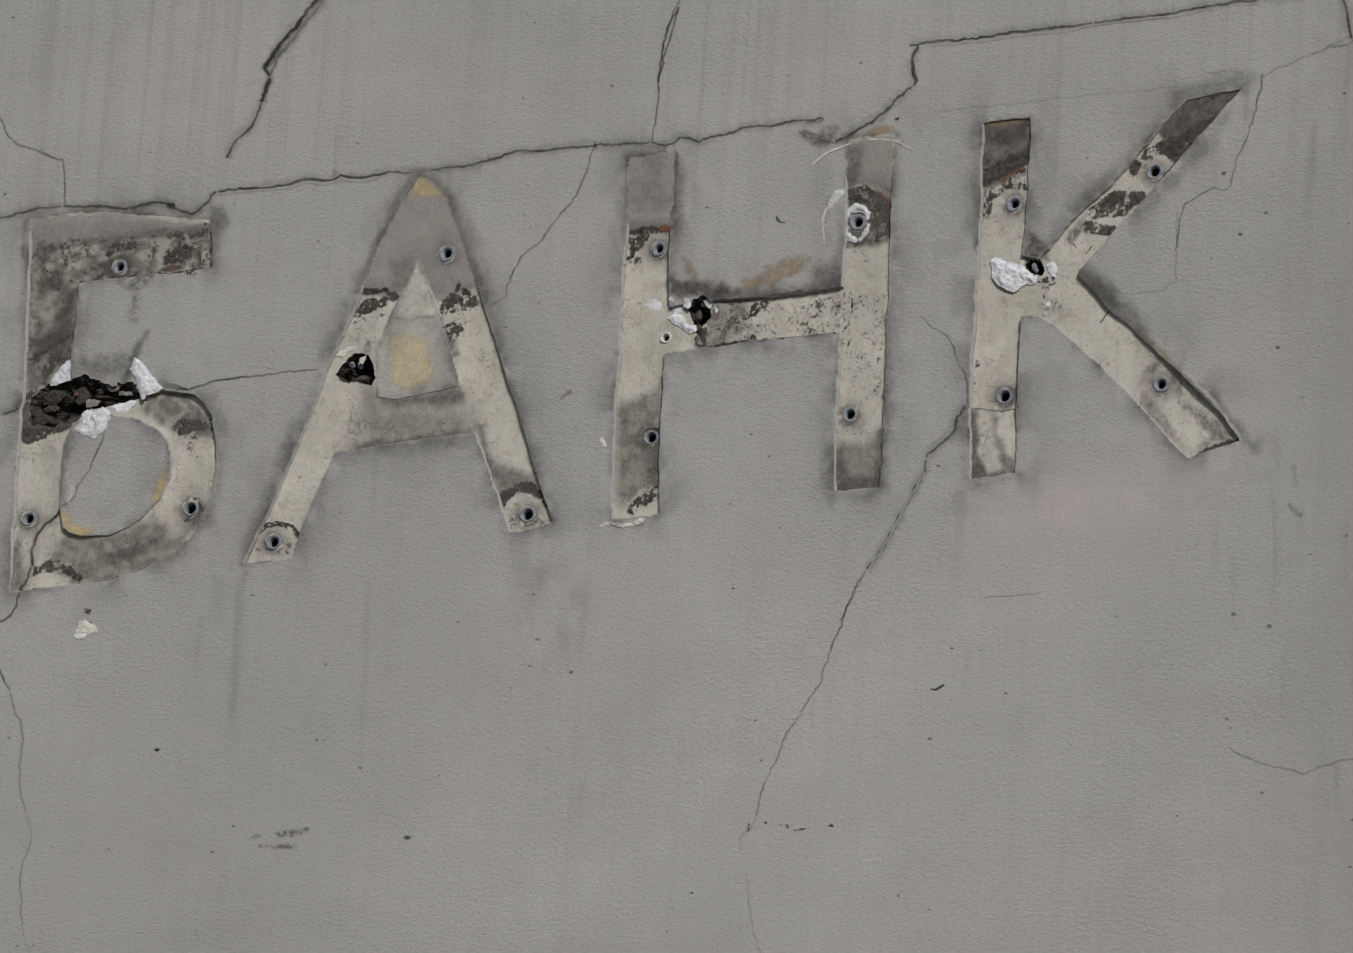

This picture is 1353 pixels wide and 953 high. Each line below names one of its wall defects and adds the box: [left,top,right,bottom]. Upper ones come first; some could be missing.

crack [21,0,1246,215]
spalling [28,357,164,439]
crack [0,511,60,622]
crack [867,406,997,570]